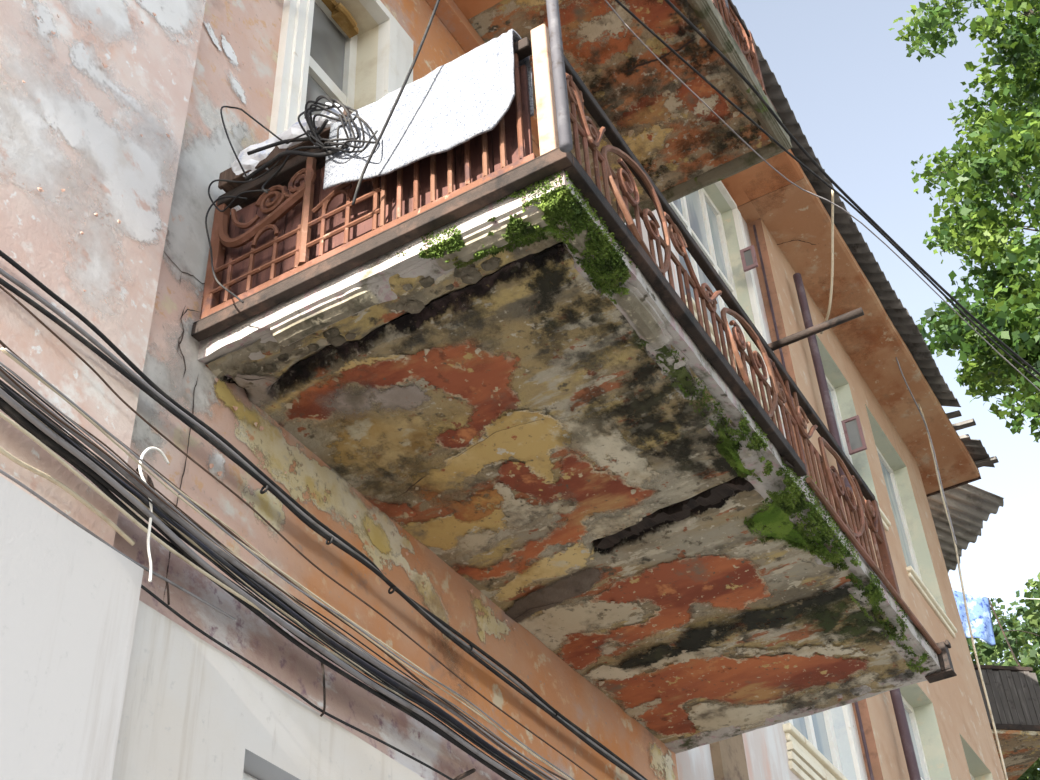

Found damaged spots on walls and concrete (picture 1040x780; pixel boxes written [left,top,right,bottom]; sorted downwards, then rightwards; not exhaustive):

peeling [31,0,247,104]
peeling [516,0,690,65]
peeling [614,73,740,165]
peeling [0,41,248,312]
damp [511,243,632,344]
damp [586,351,738,485]
peeling [131,242,879,737]
damp [618,585,892,672]